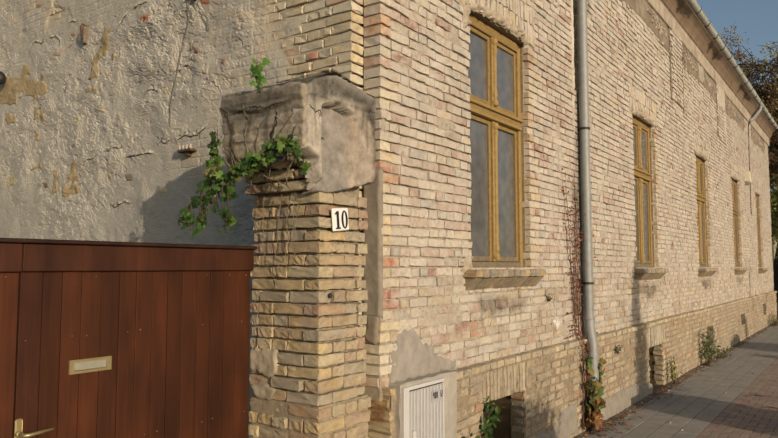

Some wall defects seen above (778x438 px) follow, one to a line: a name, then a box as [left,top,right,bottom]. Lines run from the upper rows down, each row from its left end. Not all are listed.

peeling [86,26,115,96]
peeling [0,64,48,125]
crack [103,102,291,162]
peeling [42,159,82,197]